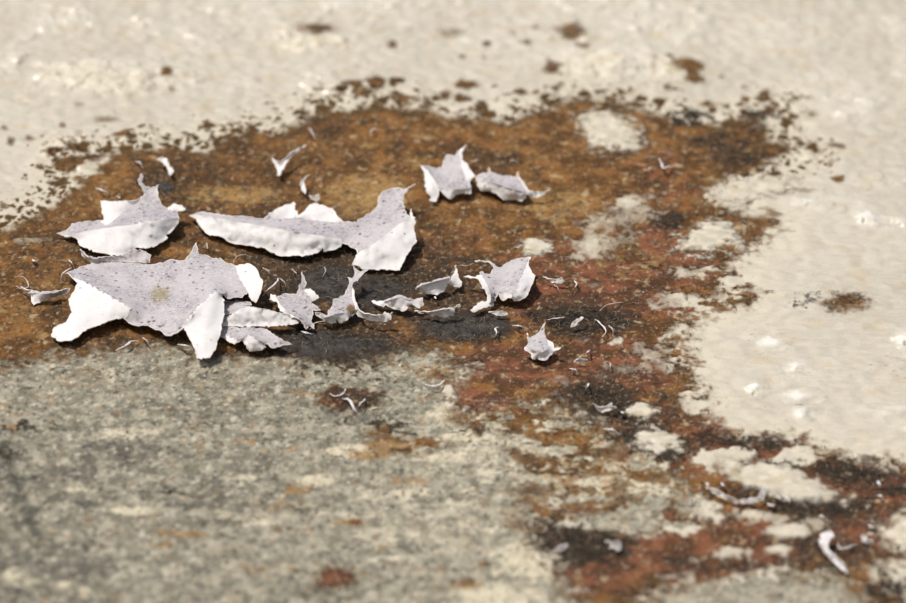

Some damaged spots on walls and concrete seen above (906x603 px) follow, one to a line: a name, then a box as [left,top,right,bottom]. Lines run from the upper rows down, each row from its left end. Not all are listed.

rust [364,76,386,91]
rust [389,77,405,87]
rust [455,79,477,88]
rust [0,83,818,447]
rust [821,293,871,312]
water stain [266,331,397,384]
spalling [0,145,768,603]
water stain [2,419,65,432]
water stain [367,409,416,435]
rust [509,408,906,603]
rust [314,566,359,588]
spalling [640,531,870,603]